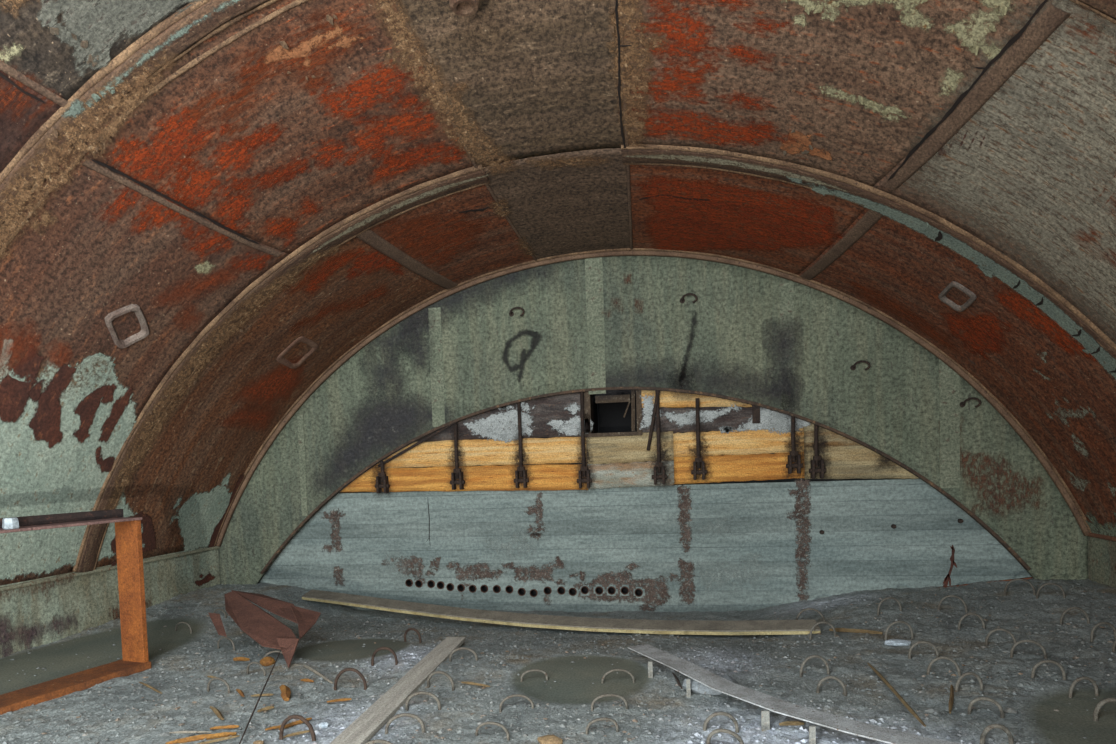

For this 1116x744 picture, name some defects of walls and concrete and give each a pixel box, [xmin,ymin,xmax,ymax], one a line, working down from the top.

rust [0,43,23,61]
crack [615,0,631,150]
rust [628,0,793,147]
rust [100,58,466,274]
peeling [607,0,1116,380]
peeling [0,0,521,580]
water stain [320,269,544,484]
peeling [639,394,811,435]
rust [960,452,1041,517]
rust [994,290,1097,361]
peeling [1047,398,1096,459]